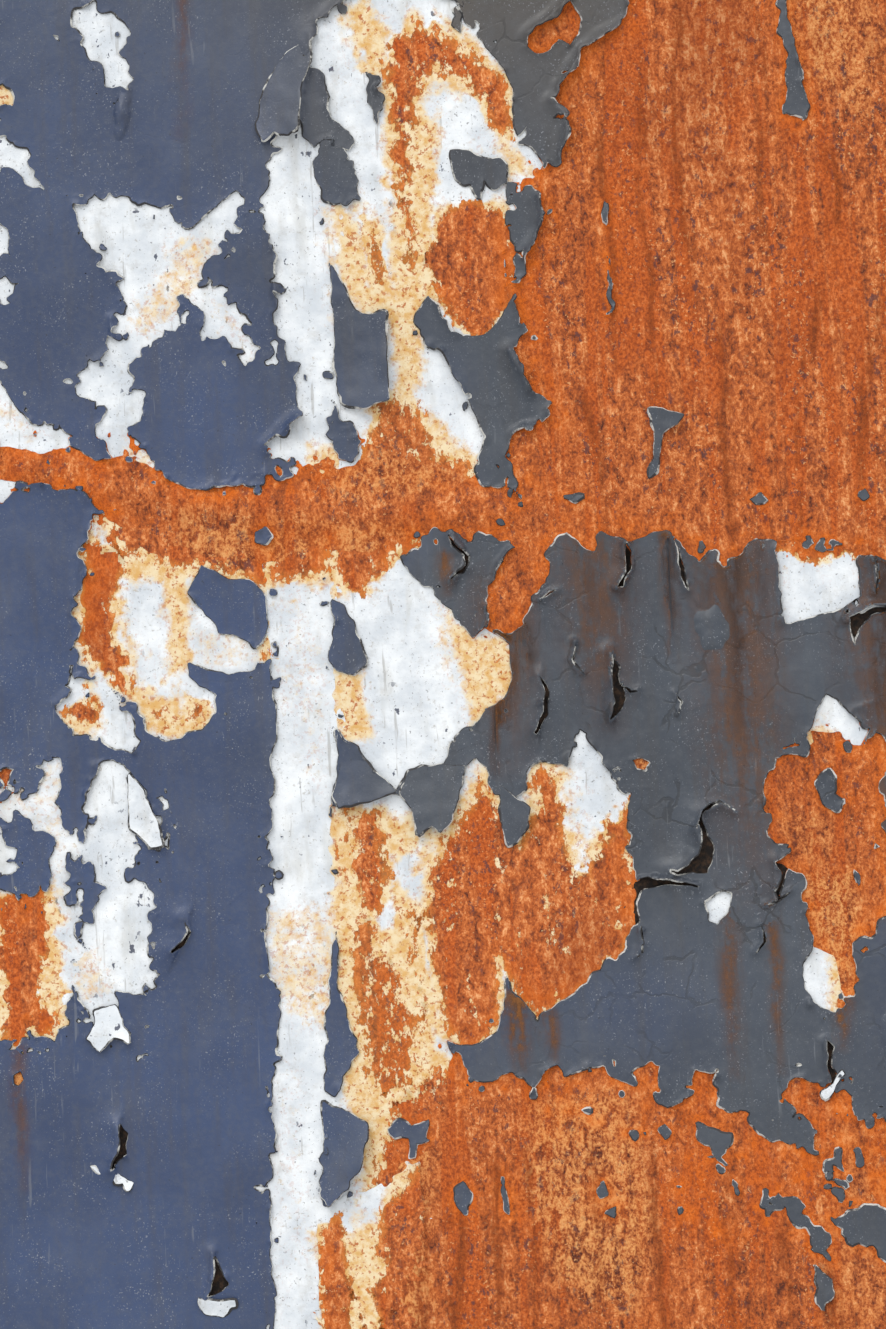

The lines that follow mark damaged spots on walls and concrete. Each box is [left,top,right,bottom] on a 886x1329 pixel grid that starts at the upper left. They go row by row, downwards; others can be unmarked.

peeling [0,85,44,190]
peeling [64,0,543,478]
corrosion [0,0,886,655]
peeling [0,361,71,454]
peeling [776,539,886,638]
corrosion [493,700,506,739]
peeling [807,695,868,745]
peeling [0,514,716,1329]
corrosion [763,722,886,1027]
corrosion [505,993,526,1049]
peeling [803,936,854,1019]
corrosion [392,1029,886,1329]